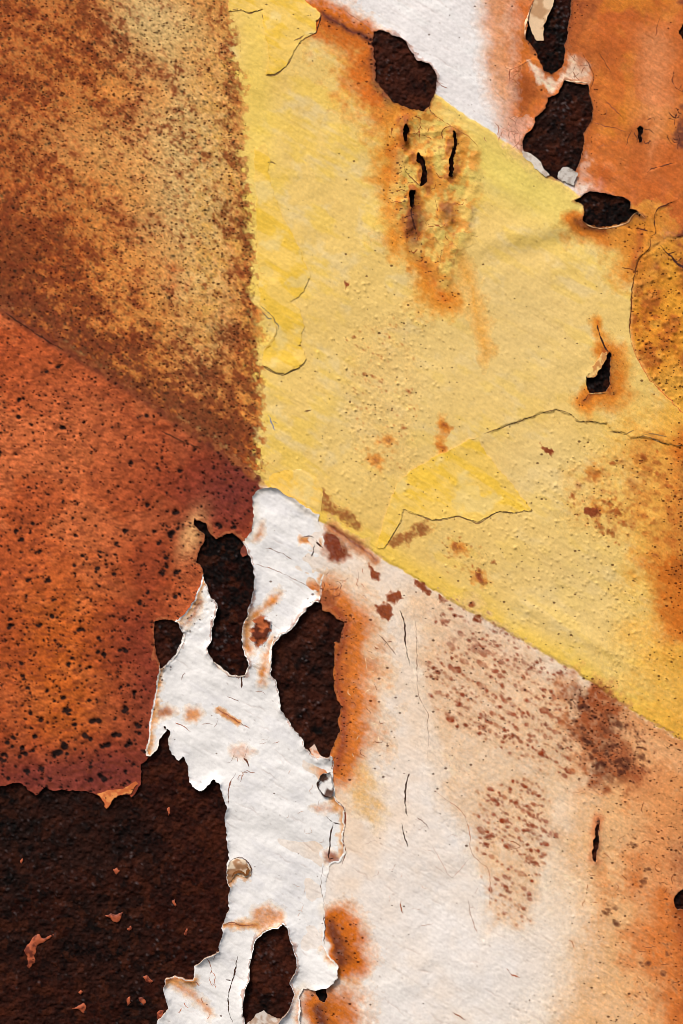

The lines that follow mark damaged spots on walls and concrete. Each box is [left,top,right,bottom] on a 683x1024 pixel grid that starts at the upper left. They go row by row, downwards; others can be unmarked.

peeling [368,30,437,111]
peeling [494,0,643,229]
rust [0,0,274,801]
crack [484,395,683,446]
peeling [586,352,611,394]
rust [215,0,683,1024]
crack [386,510,533,546]
peeling [0,469,346,1024]
crack [582,821,674,906]